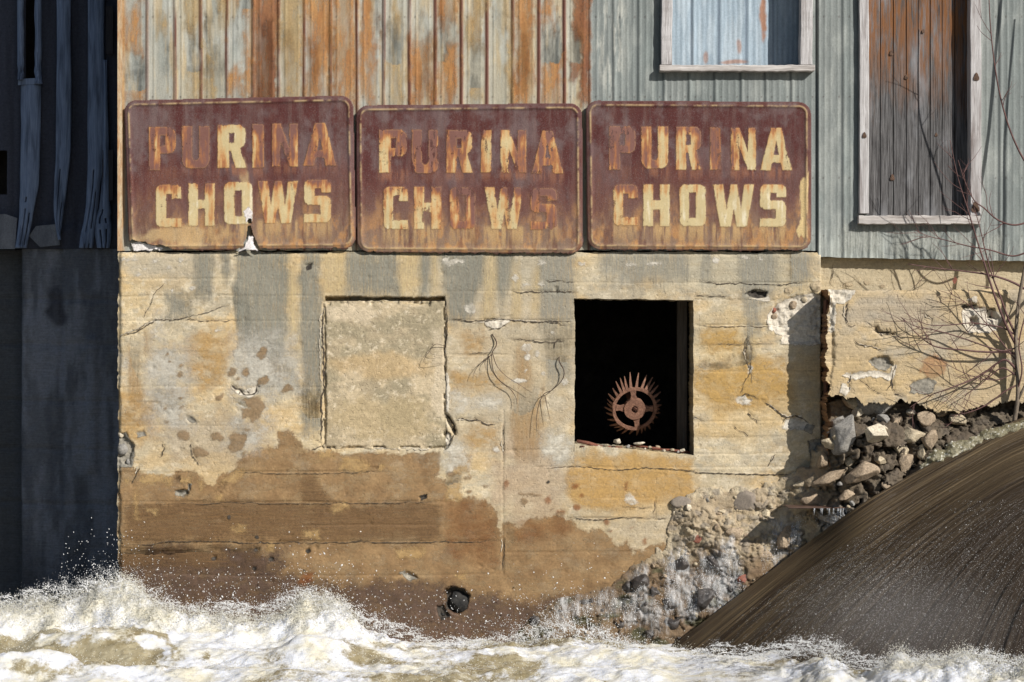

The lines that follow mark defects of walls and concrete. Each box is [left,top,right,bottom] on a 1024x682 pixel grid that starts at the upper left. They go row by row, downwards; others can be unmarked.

corrosion [228,0,376,106]
corrosion [392,44,457,105]
corrosion [506,0,592,106]
crack [120,285,235,336]
spalling [745,281,885,346]
spalling [232,386,259,398]
spalling [840,357,897,396]
spalling [909,378,937,394]
water stain [117,251,667,643]